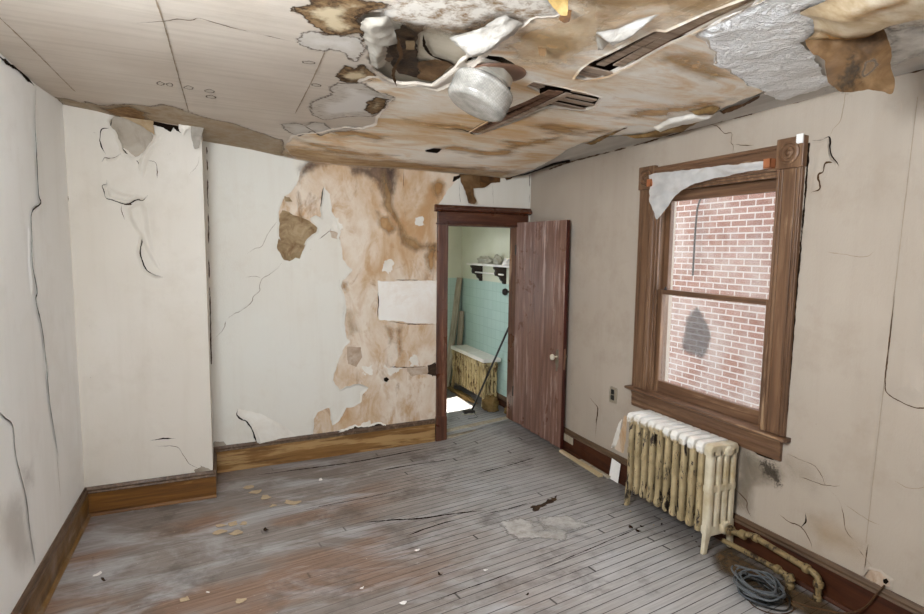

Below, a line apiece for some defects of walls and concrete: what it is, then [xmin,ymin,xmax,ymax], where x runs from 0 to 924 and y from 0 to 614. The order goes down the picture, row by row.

peeling [99,115,181,178]
peeling [276,0,830,434]
crack [0,57,60,486]
crack [206,147,282,364]
crack [787,97,845,415]
peeling [611,415,627,453]
crack [0,409,37,568]
water stain [739,455,781,503]
crack [755,452,831,486]
crack [780,515,812,546]
crack [841,507,879,568]